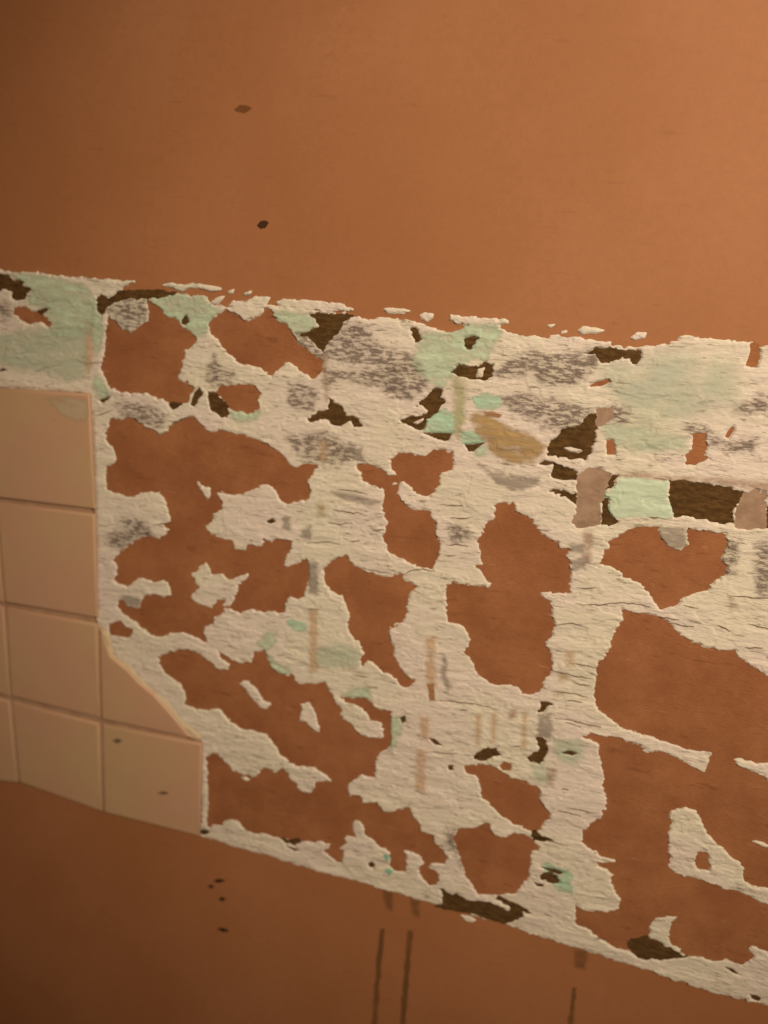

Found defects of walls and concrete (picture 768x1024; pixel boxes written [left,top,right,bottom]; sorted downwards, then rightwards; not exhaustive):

spalling [0,274,51,327]
peeling [547,324,605,335]
spalling [587,332,647,364]
peeling [746,342,760,367]
spalling [539,413,615,504]
peeling [685,433,708,465]
peeling [96,282,572,924]
peeling [574,475,768,975]